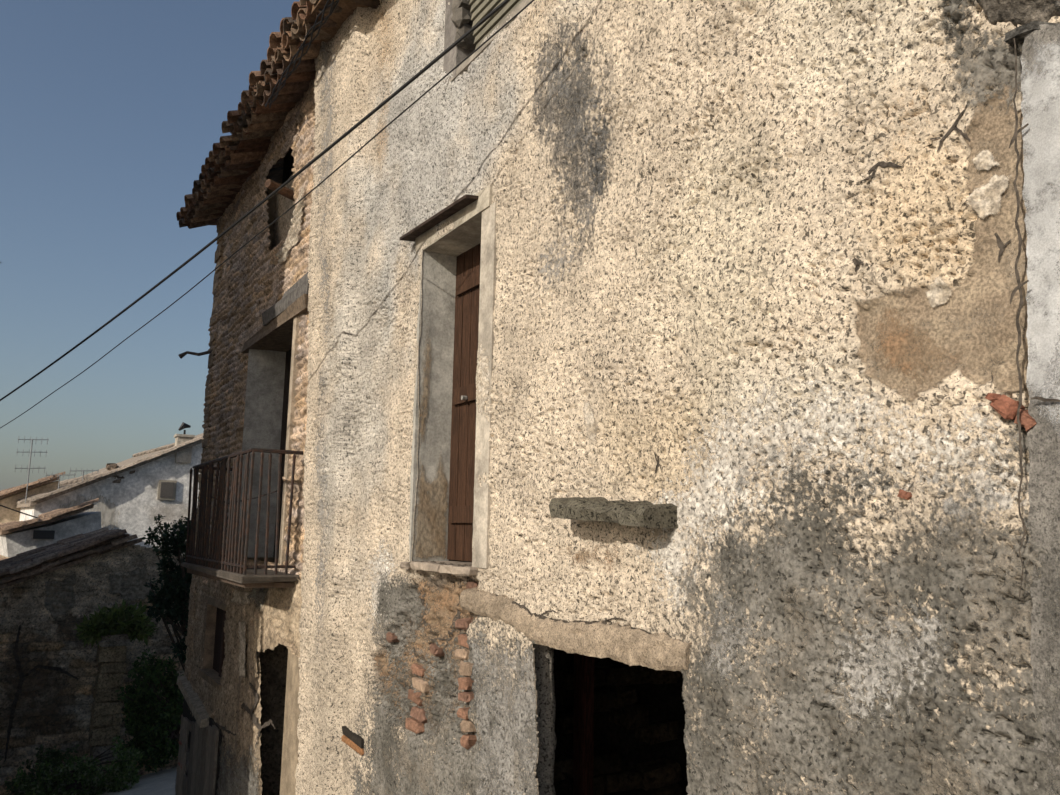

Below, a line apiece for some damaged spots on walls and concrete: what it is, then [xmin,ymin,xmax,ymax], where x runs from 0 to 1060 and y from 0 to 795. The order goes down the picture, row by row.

damp [533,23,611,284]
flaking render [856,73,1037,451]
flaking render [374,574,479,750]
crack [496,594,652,634]